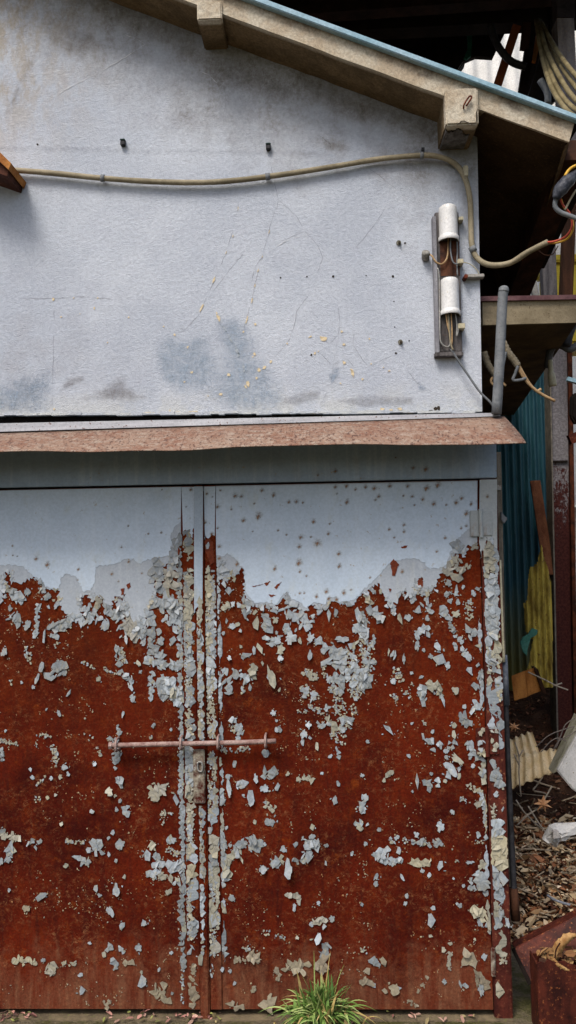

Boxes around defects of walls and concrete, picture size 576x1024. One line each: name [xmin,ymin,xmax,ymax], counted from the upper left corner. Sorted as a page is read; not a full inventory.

crack [181,167,323,353]
corrosion [204,522,220,565]
corrosion [389,559,404,591]
peeling [0,529,513,1009]
peeling [250,986,277,1015]